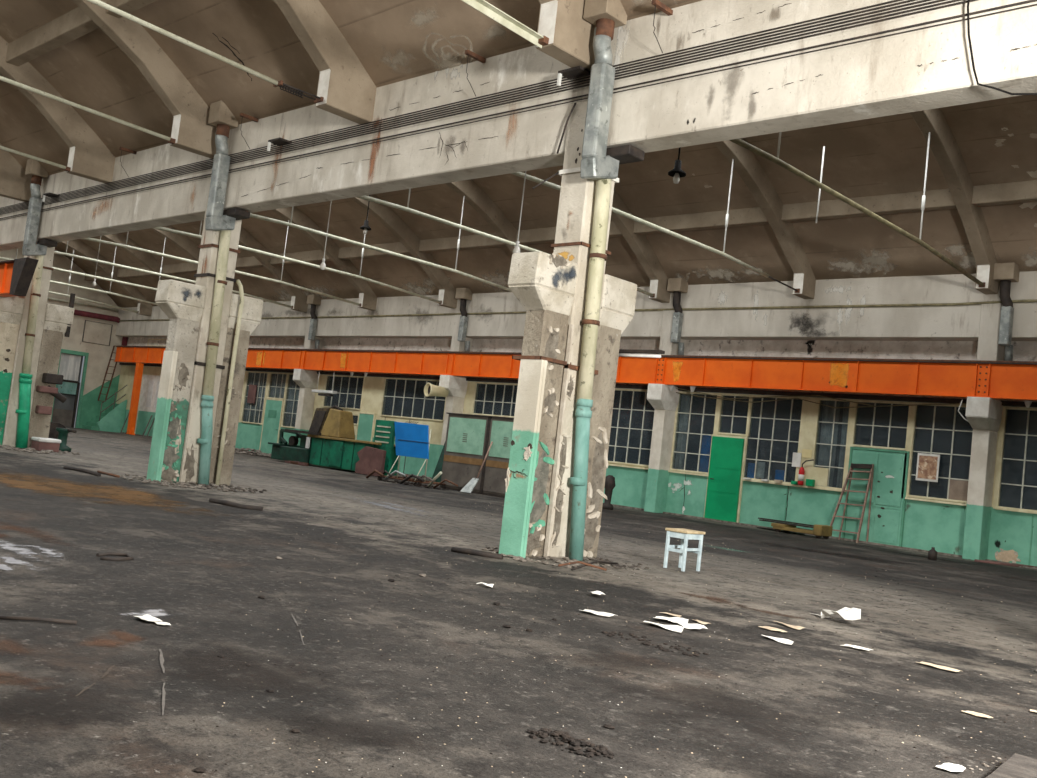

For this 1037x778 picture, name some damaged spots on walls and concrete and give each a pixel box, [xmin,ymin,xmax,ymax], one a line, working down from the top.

corrosion [369,119,380,176]
spalling [176,363,191,391]
spalling [161,402,199,483]
spalling [523,435,571,557]